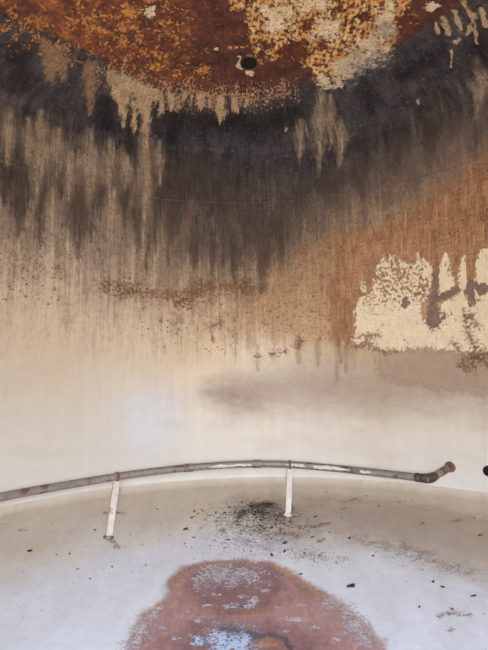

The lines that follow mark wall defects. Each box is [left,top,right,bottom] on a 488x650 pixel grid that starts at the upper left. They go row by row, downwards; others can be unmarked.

corrosion [228,7,264,65]
peeling [228,0,419,91]
peeling [424,1,441,12]
peeling [434,0,488,68]
leakage [0,33,488,300]
corrosion [320,156,488,354]
corrosion [100,273,264,311]
peeling [350,248,488,357]
corrosion [453,310,488,373]
leakage [234,500,488,556]
corrosion [130,553,384,650]